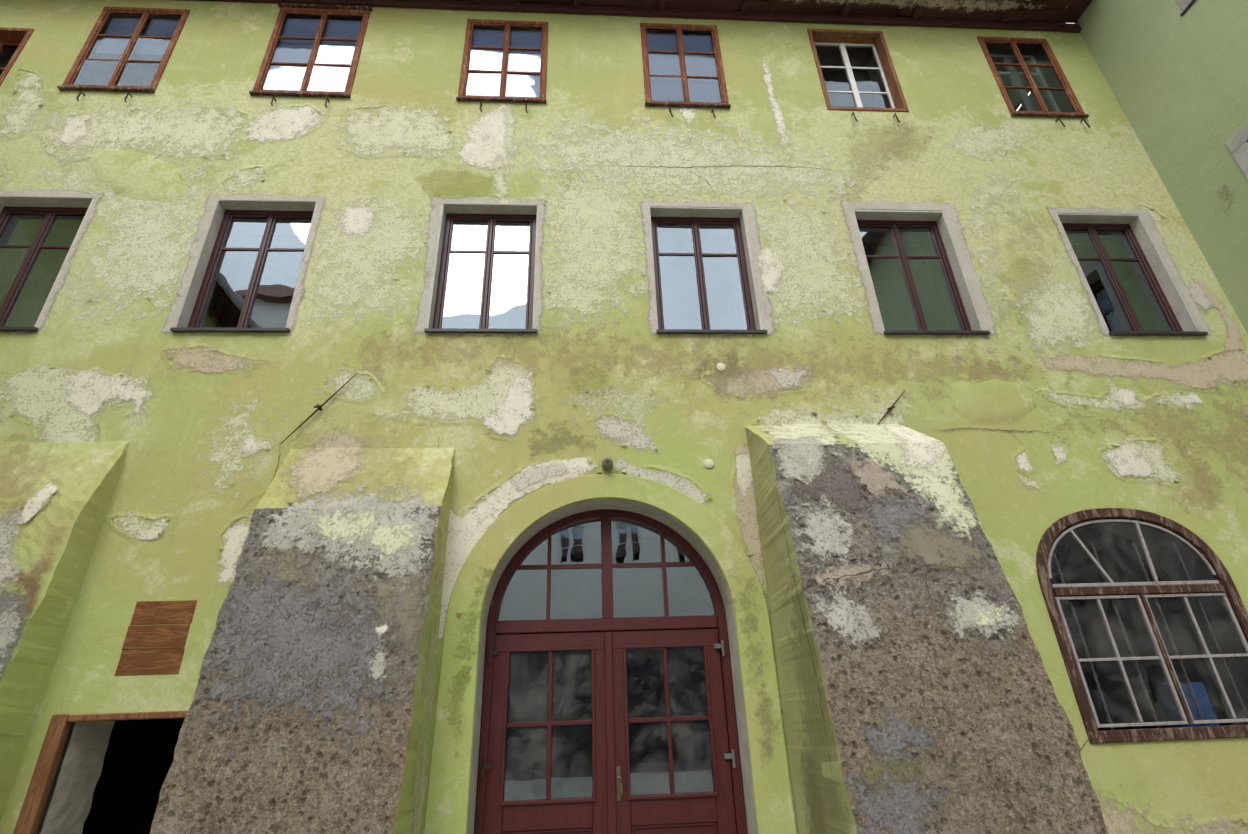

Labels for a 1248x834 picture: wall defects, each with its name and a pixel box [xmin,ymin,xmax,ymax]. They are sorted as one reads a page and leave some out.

peeling [816,0,1045,13]
peeling [0,66,457,329]
flaking render [0,482,58,680]
flaking render [0,364,159,444]
flaking render [319,353,544,443]
spalling [193,384,714,756]
peeling [698,363,983,658]
peeling [943,588,1023,640]
crack [939,428,1052,444]
flaking render [1015,274,1248,415]
flaking render [1097,437,1183,489]
spalling [847,703,966,834]